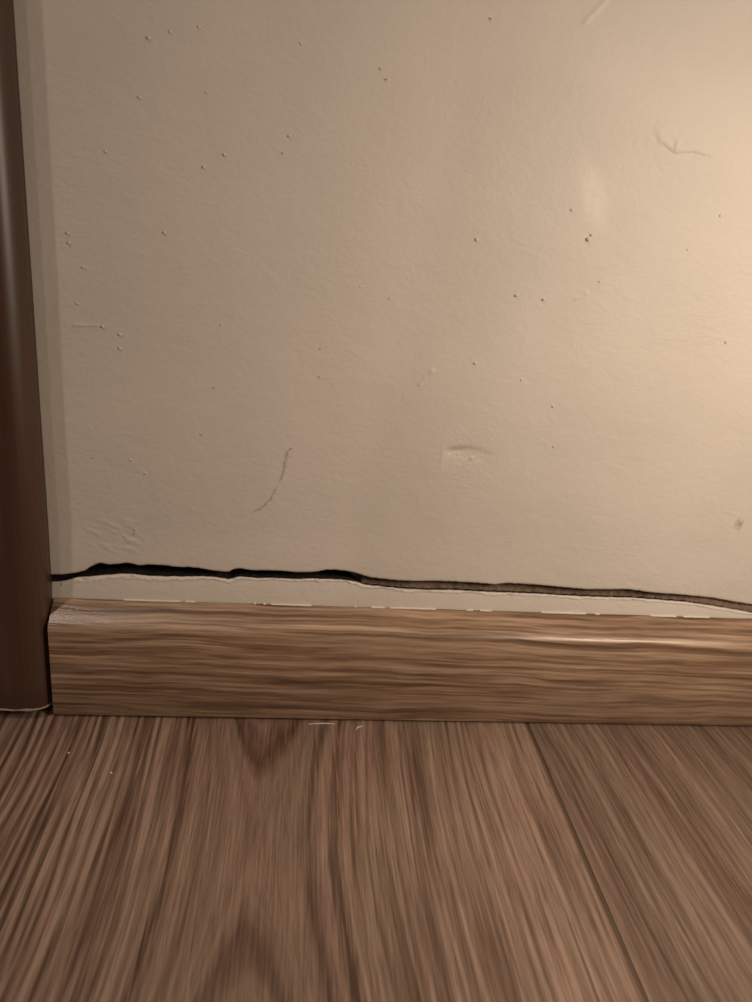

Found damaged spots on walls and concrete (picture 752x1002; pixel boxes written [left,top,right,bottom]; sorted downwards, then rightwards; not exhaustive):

crack [52,563,752,615]